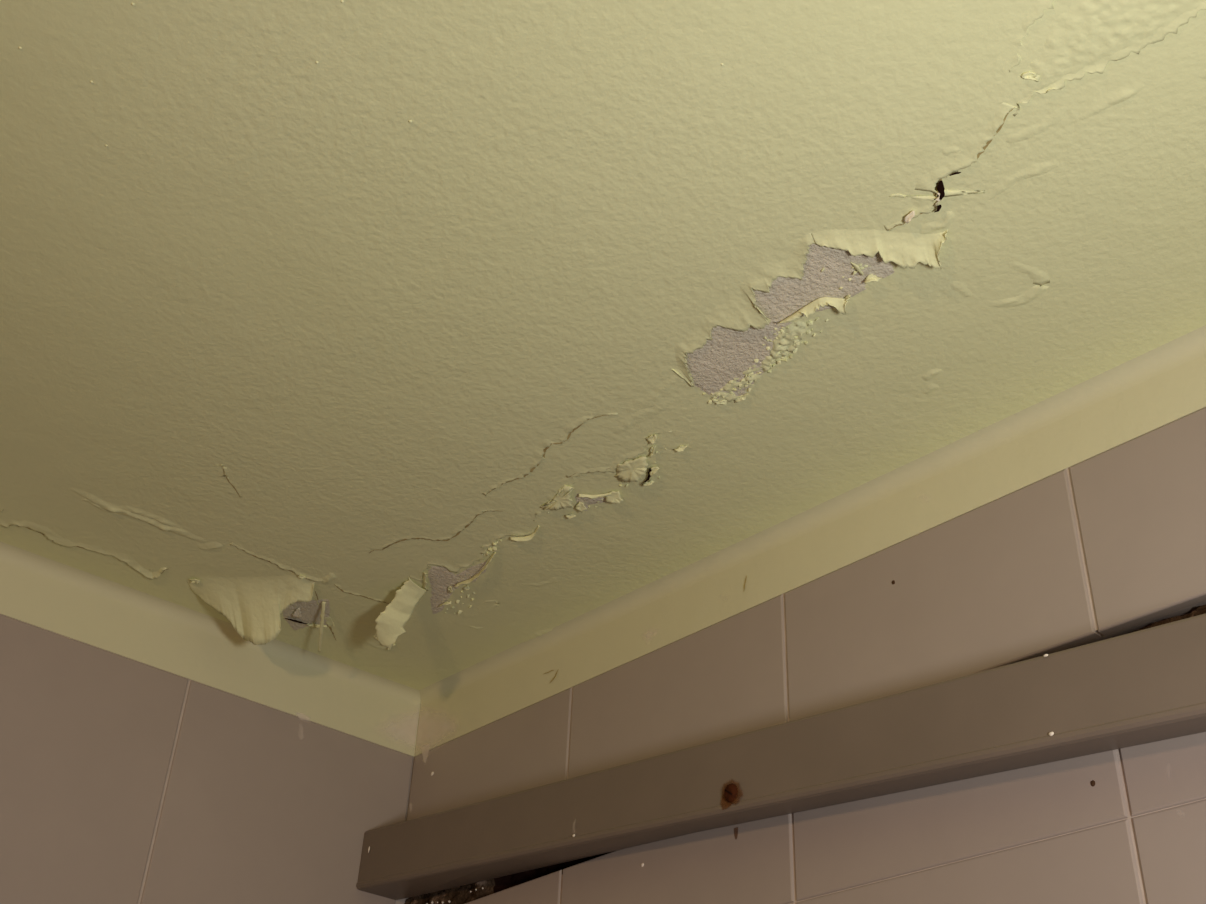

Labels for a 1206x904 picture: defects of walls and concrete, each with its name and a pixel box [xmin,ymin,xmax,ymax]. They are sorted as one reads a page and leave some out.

peeling [671,229,948,405]
crack [0,509,167,580]
crack [368,509,497,553]
peeling [374,431,687,650]
peeling [187,575,330,652]
spalling [1131,605,1206,633]
spalling [405,851,614,904]